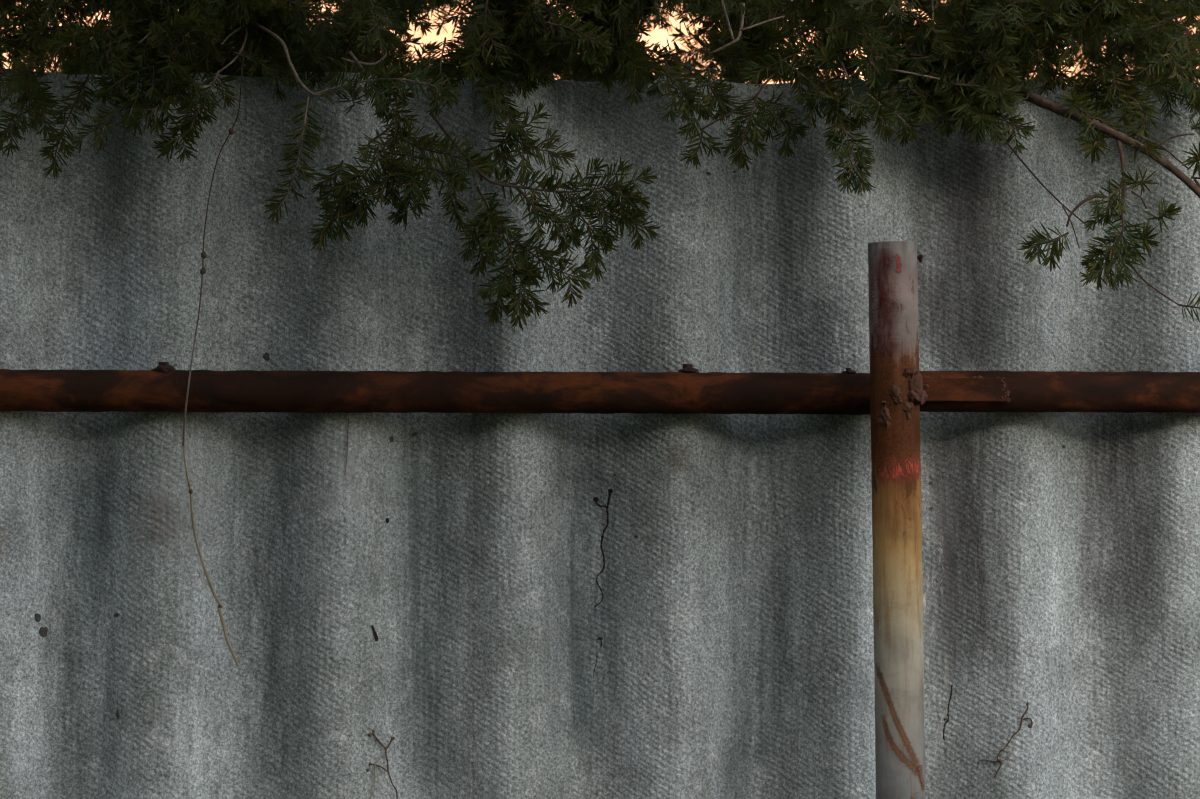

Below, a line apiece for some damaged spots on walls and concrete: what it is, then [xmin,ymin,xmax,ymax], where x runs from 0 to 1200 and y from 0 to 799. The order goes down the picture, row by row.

crack [593,489,613,607]
crack [593,637,603,677]